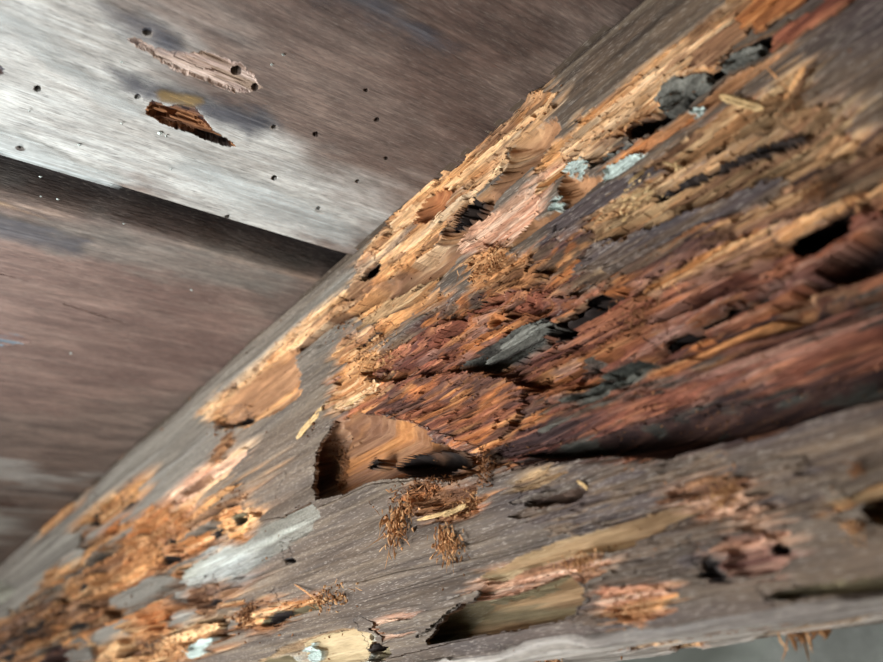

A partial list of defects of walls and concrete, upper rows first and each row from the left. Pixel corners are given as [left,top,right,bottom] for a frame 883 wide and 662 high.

spalling [0,480,326,662]
spalling [197,0,883,628]